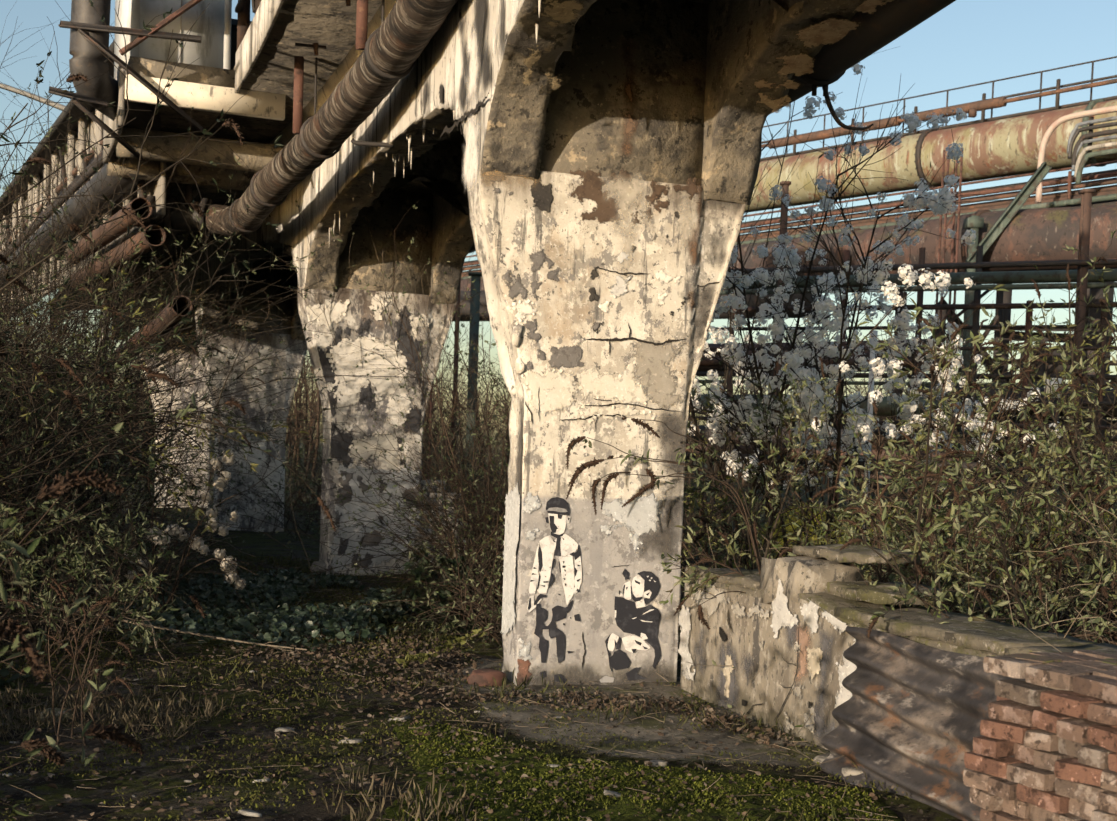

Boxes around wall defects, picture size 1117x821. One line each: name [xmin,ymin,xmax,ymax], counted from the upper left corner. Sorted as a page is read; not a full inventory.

spalling [754,0,892,113]
spalling [531,162,554,213]
peeling [306,299,350,330]
peeling [369,294,387,321]
peeling [410,314,433,334]
peeling [500,245,691,423]
crack [586,322,687,355]
peeling [326,334,421,573]
peeling [678,579,857,735]